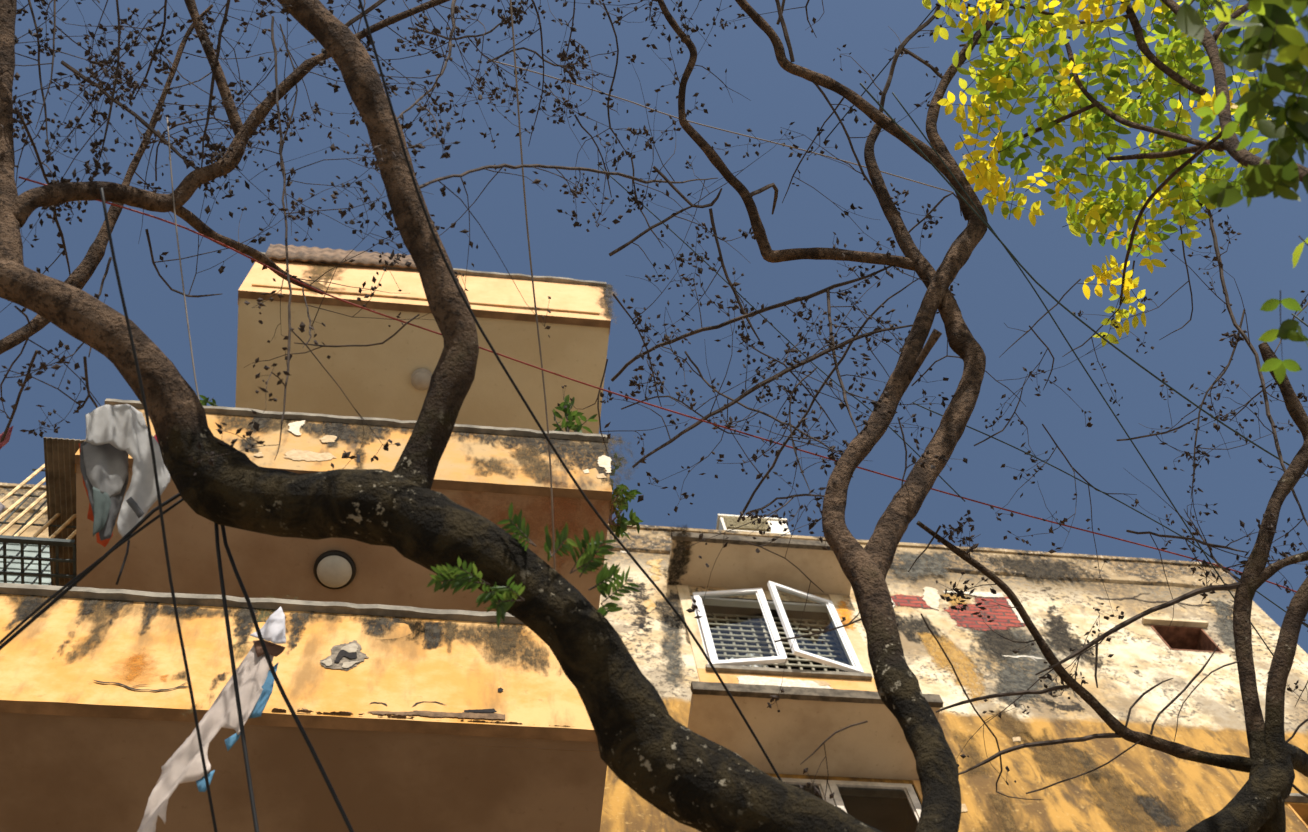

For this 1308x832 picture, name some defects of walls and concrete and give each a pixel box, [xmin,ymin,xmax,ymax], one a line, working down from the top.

peeling [284,420,337,461]
leakage [217,415,413,469]
leakage [891,552,950,579]
leakage [0,593,61,629]
leakage [60,598,337,660]
flaking render [320,640,369,671]
leakage [353,614,549,672]
leakage [639,525,692,687]
flaking render [891,587,1025,631]
leakage [1210,595,1236,659]
crack [94,680,188,691]
leakage [963,555,1202,832]